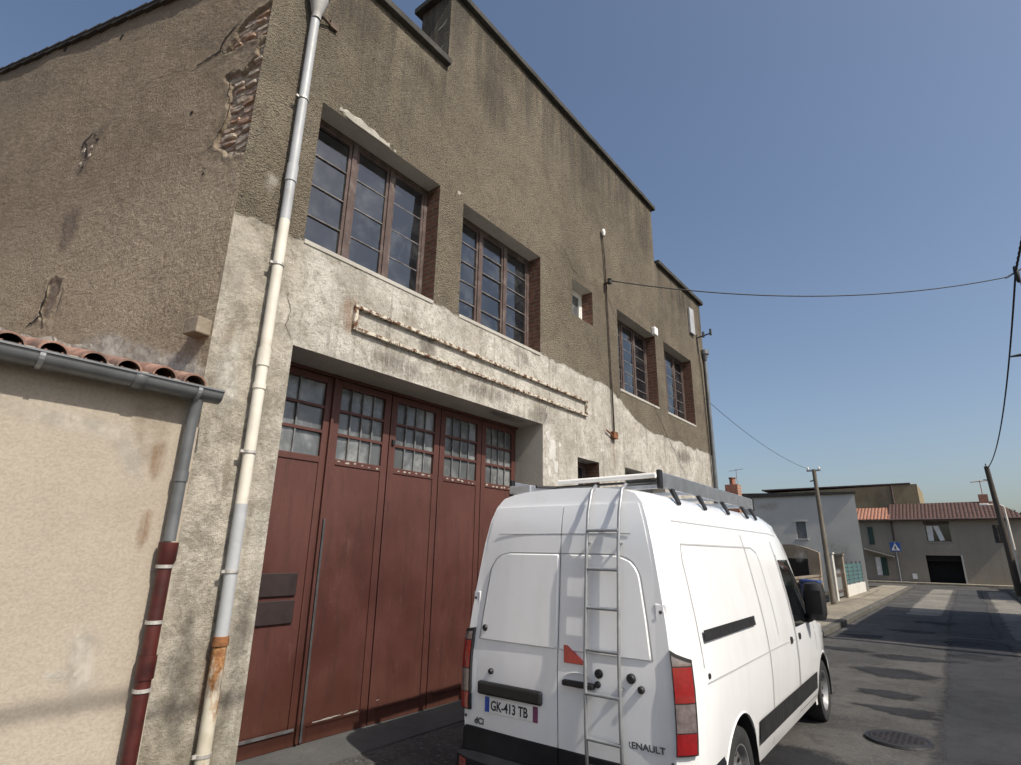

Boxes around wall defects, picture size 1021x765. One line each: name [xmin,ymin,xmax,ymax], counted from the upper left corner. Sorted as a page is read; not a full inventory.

flaking render [79,133,99,172]
crack [145,21,240,159]
flaking render [217,6,272,155]